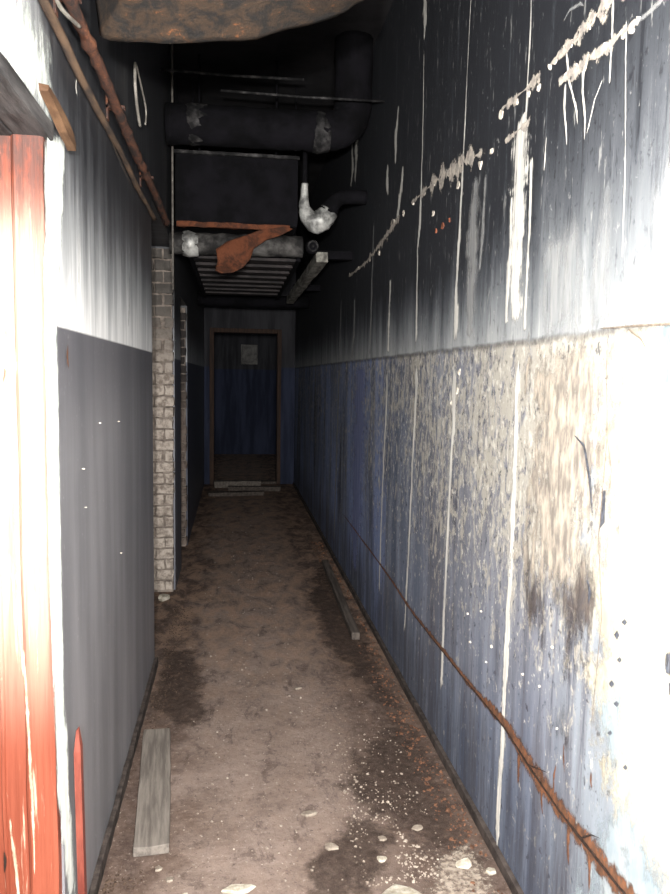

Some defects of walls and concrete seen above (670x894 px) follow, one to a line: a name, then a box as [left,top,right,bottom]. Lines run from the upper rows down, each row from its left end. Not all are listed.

water stain [386,106,403,216]
water stain [415,126,423,339]
water stain [454,82,486,340]
water stain [505,0,533,329]
water stain [545,237,579,328]
water stain [563,0,614,145]
water stain [404,365,418,629]
water stain [440,368,456,690]
rust [345,517,635,894]
water stain [495,360,521,845]
water stain [526,583,541,624]
water stain [561,557,594,676]